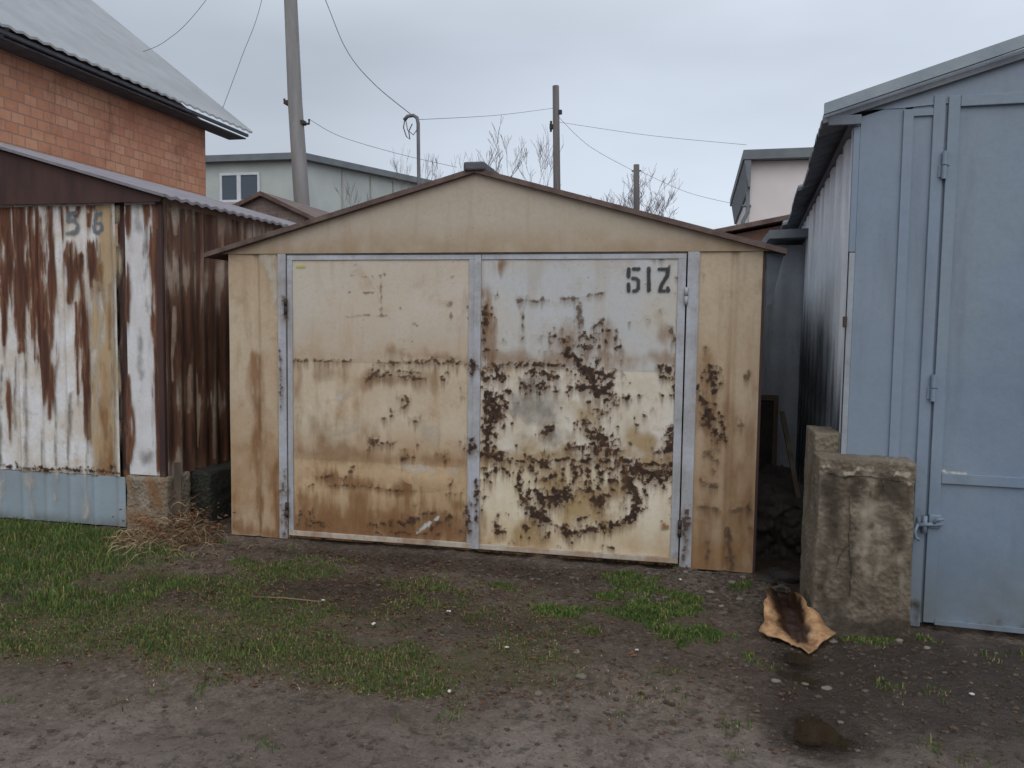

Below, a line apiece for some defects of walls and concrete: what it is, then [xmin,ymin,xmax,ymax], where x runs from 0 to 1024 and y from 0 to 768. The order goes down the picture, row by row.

rust [0,204,263,476]
rust [233,292,683,560]
rust [696,364,744,489]
crack [827,472,904,597]